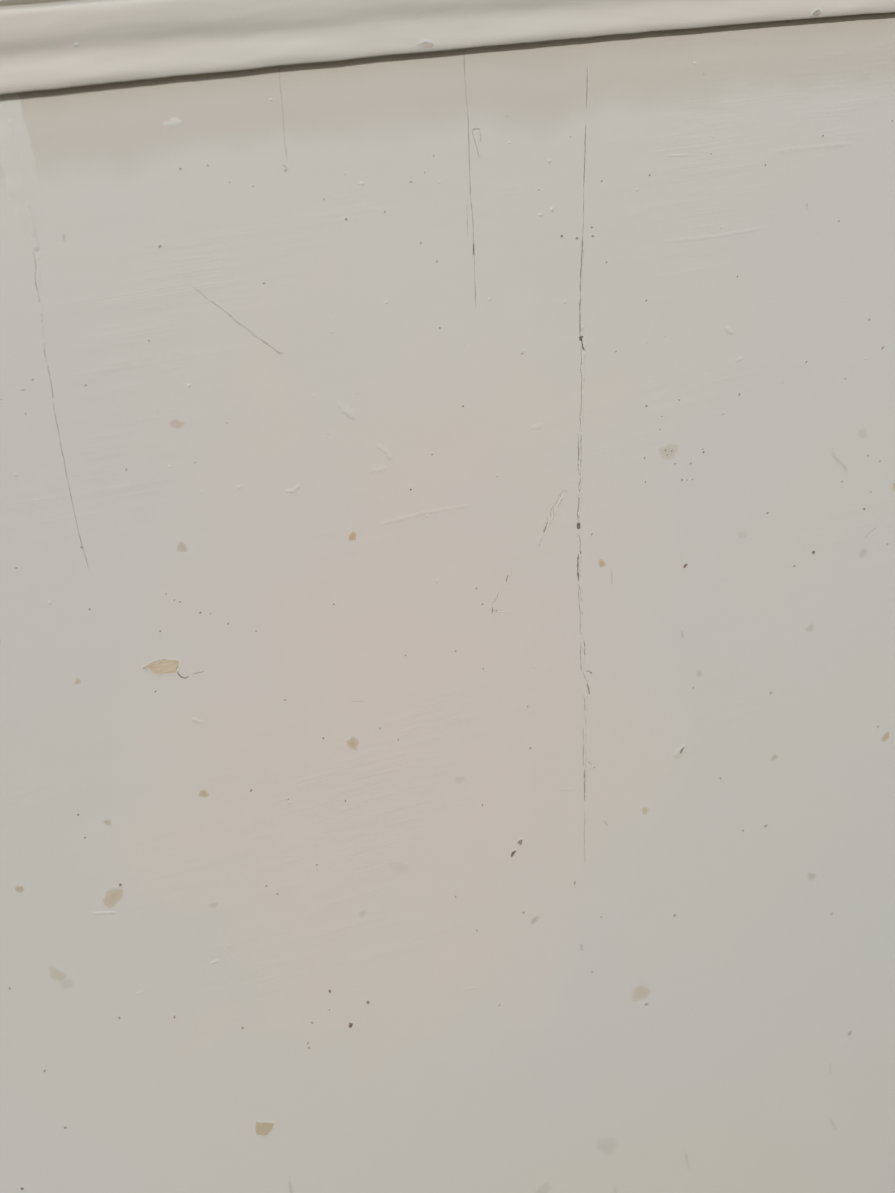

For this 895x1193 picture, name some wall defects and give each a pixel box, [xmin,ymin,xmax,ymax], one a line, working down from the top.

crack [577,66,596,855]
peeling [140,657,204,693]
peeling [253,1120,276,1137]